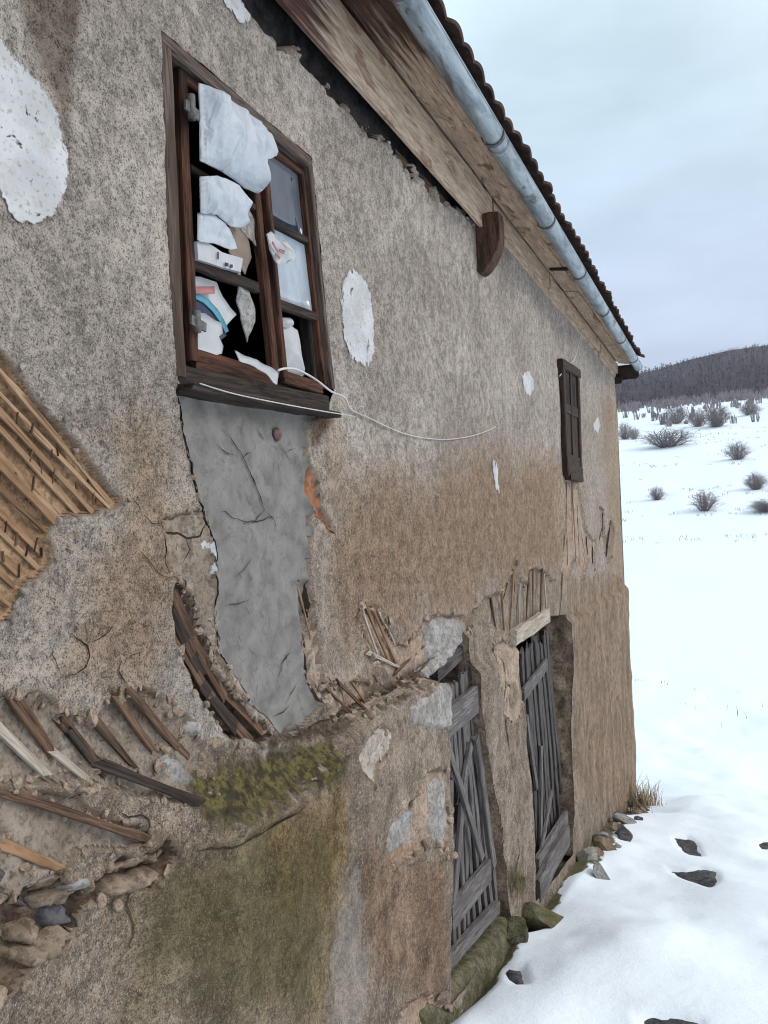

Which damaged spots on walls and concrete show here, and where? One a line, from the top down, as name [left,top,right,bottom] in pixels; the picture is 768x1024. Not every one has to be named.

flaking render [224,0,477,226]
crack [126,397,292,579]
flaking render [303,467,337,533]
flaking render [161,469,252,713]
peeling [398,559,529,648]
peeling [0,771,41,796]
peeling [49,757,171,879]
peeling [38,685,221,802]
flaking render [295,579,393,791]
peeling [80,849,131,913]